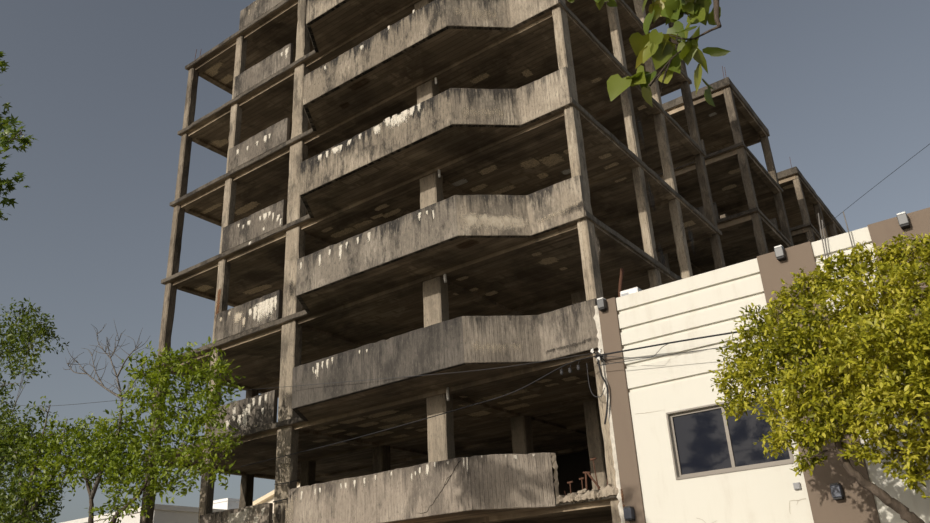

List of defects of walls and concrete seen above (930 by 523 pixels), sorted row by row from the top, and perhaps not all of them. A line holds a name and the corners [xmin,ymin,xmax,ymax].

spalling [551,453,619,505]
damp [275,498,297,523]